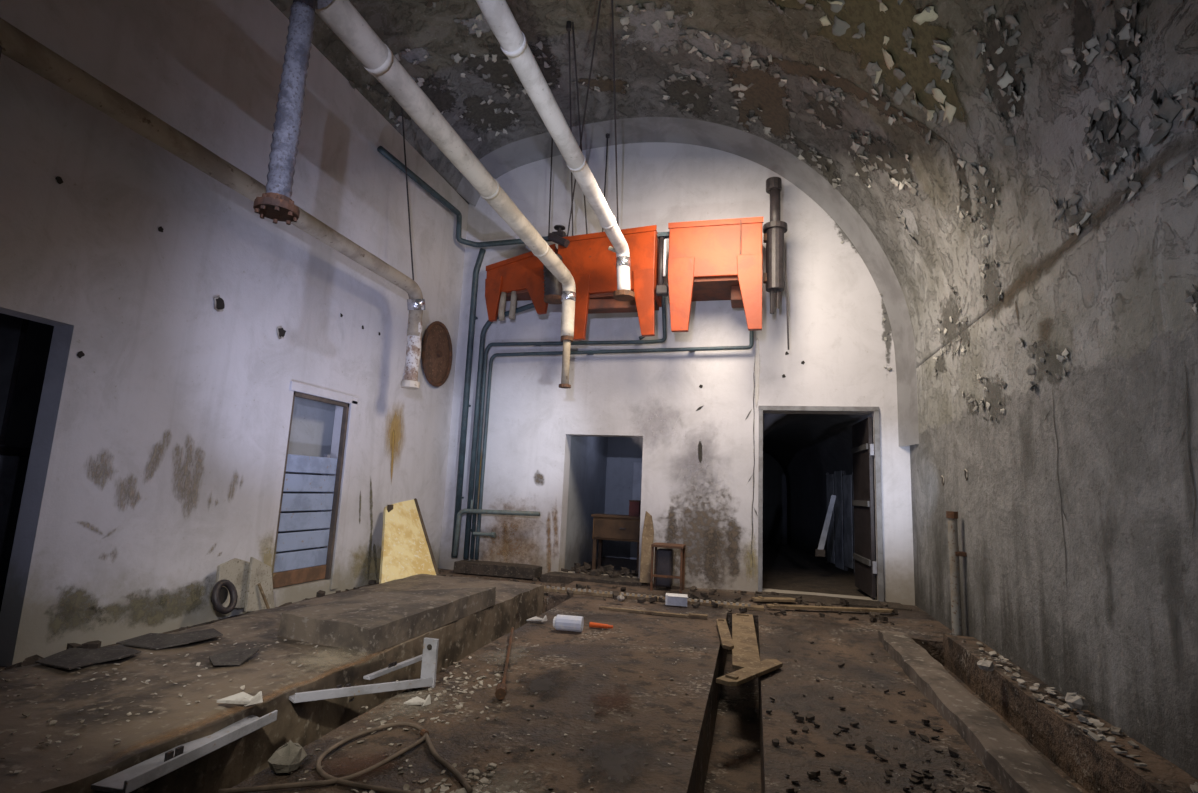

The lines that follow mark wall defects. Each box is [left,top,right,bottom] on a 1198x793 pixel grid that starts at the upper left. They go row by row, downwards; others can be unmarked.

peeling [349,80,413,127]
peeling [395,13,527,141]
peeling [528,37,629,95]
peeling [1060,0,1198,204]
peeling [615,0,1003,331]
peeling [933,283,969,377]
peeling [962,374,1006,423]
peeling [1018,337,1069,391]
water stain [666,493,756,588]
water stain [46,577,212,635]